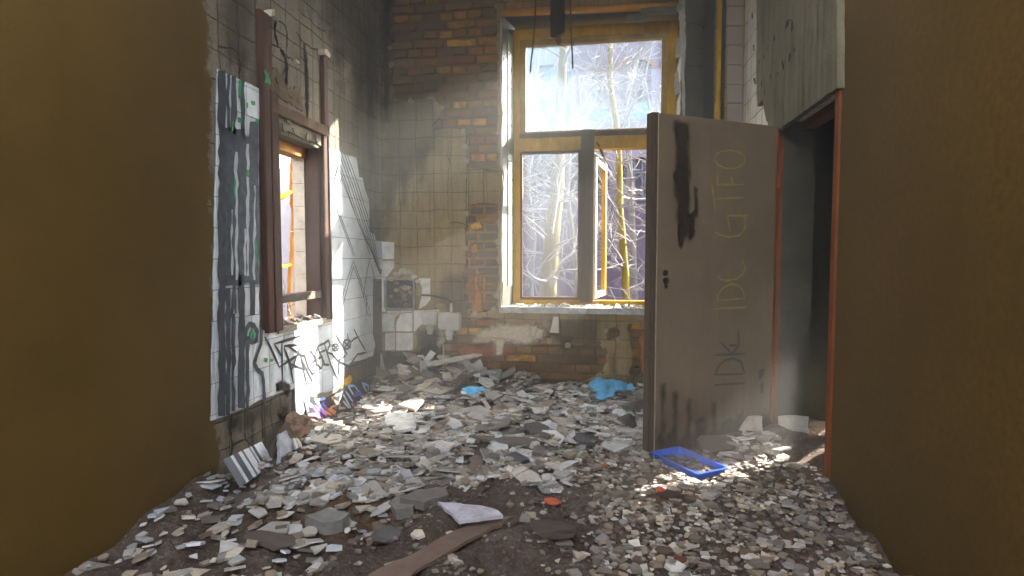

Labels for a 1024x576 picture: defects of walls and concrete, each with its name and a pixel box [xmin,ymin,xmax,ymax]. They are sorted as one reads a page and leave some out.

flaking render [387,0,531,170]
flaking render [439,202,644,383]